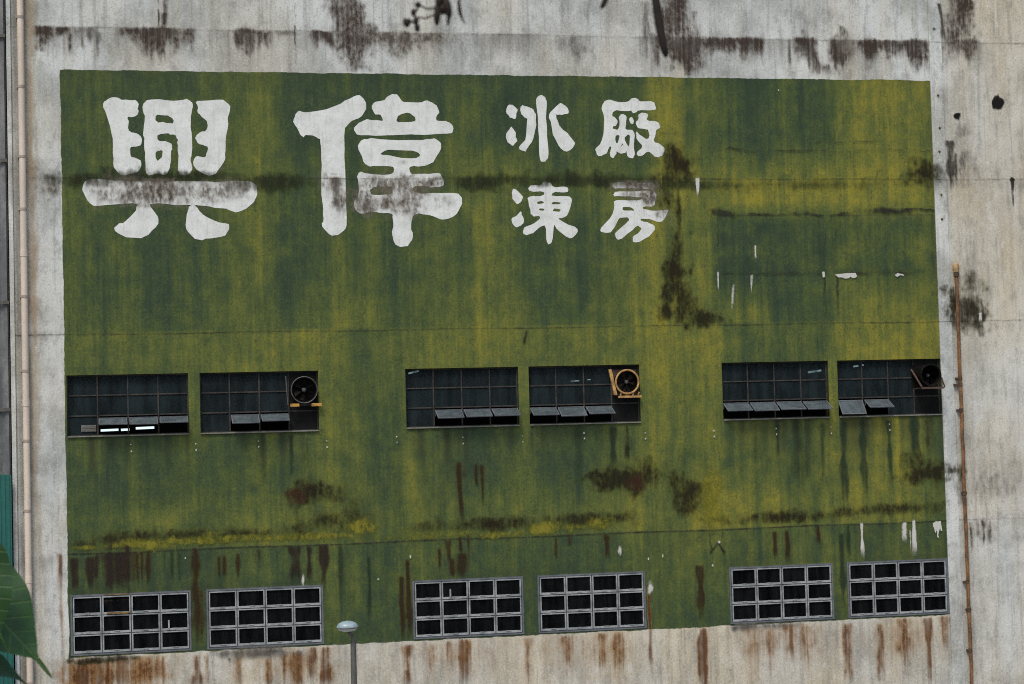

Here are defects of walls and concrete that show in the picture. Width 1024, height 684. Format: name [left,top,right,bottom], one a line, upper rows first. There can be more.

damp [375,31,447,56]
damp [457,144,723,329]
mould [941,272,988,335]
corrosion [59,541,150,593]
corrosion [191,548,203,634]
corrosion [399,560,413,632]
corrosion [62,657,165,684]
corrosion [266,647,333,684]
corrosion [598,632,624,665]
corrosion [697,628,708,684]
corrosion [843,624,852,673]
corrosion [923,616,948,674]